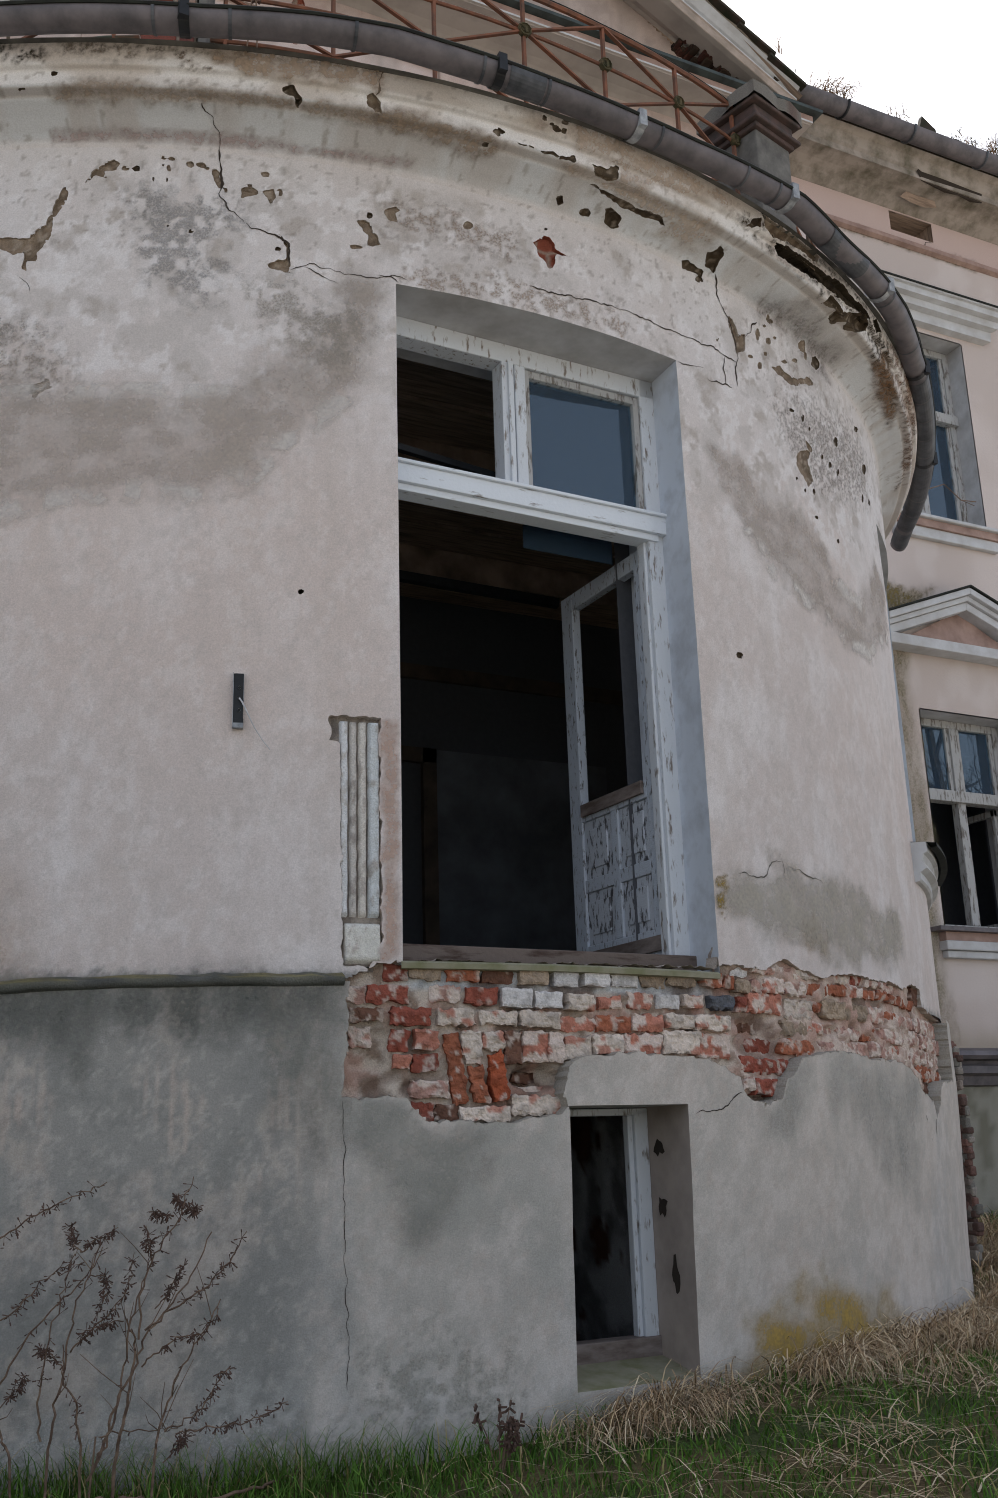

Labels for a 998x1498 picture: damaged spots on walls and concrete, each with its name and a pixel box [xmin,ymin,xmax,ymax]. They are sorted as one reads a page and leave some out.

spalling [0,187,68,271]
peeling [85,156,283,299]
crack [201,103,408,282]
spalling [350,203,515,257]
spalling [533,228,567,268]
water stain [0,281,375,519]
crack [532,274,757,388]
spalling [716,314,820,386]
spalling [774,406,870,505]
water stain [713,448,888,660]
flaking render [341,947,984,1273]
crack [342,1102,350,1385]